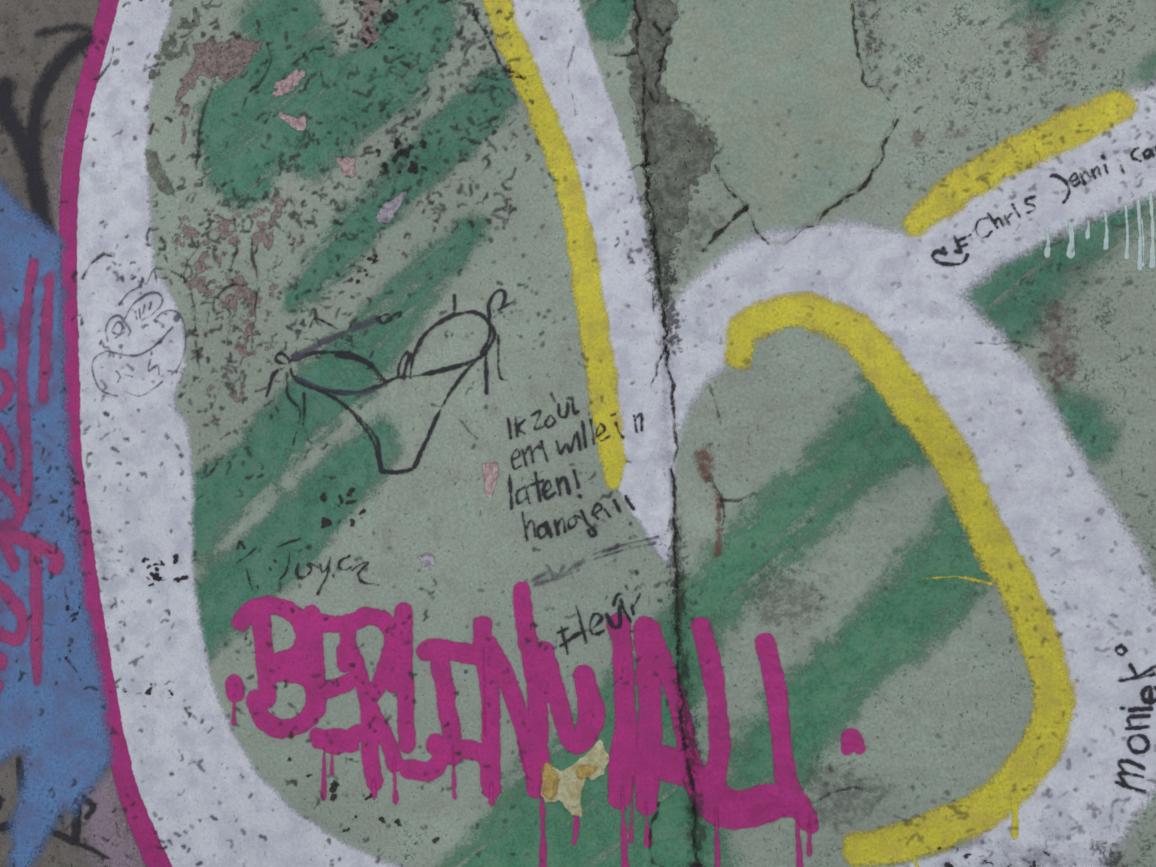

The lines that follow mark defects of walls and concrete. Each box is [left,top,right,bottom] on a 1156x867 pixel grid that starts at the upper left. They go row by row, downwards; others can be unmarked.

peeling [146,149,174,195]
peeling [148,7,263,144]
peeling [272,69,305,97]
peeling [279,112,306,131]
crack [702,3,899,252]
peeling [169,195,289,357]
crack [615,1,697,864]